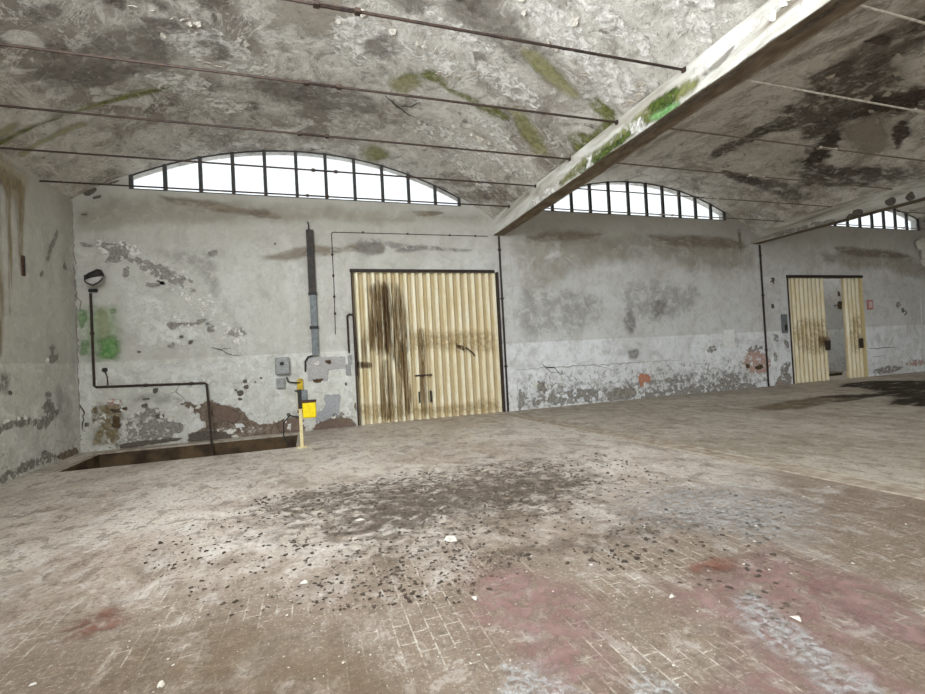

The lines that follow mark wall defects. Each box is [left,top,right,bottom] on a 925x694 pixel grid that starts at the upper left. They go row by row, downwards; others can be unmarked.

leakage [446,0,547,60]
leakage [494,0,868,236]
leakage [712,16,925,200]
leakage [654,233,741,247]
peeling [80,238,247,359]
peeling [518,353,792,409]
spalling [0,388,358,483]